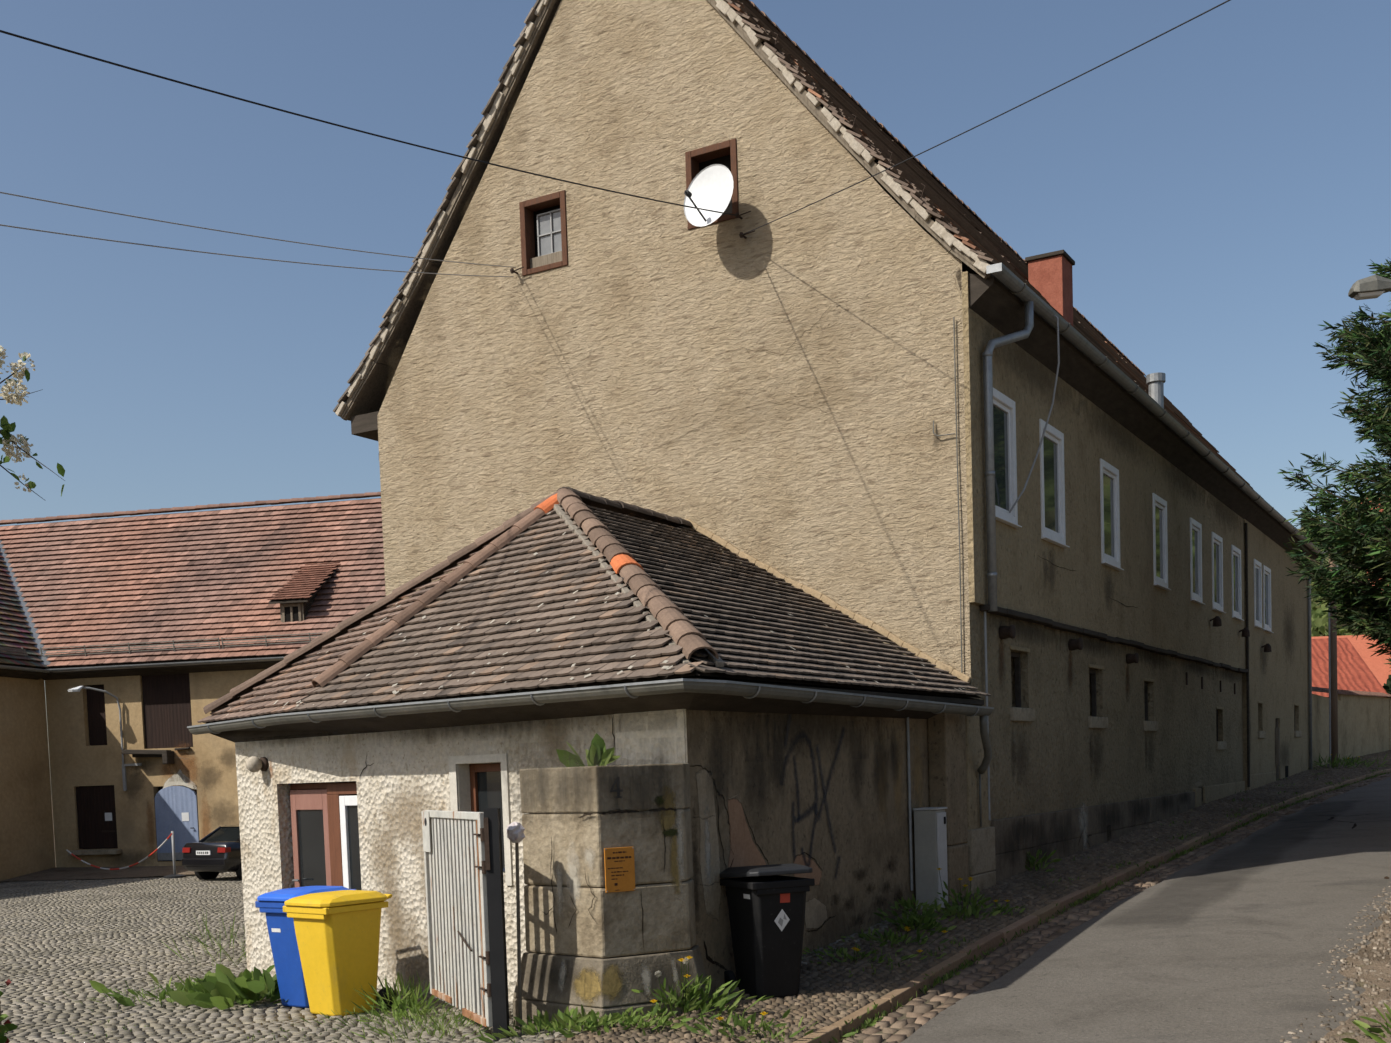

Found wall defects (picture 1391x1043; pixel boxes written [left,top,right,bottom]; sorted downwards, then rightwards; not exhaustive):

crack [543,837,596,933]
crack [692,765,734,896]
spalling [694,769,769,921]